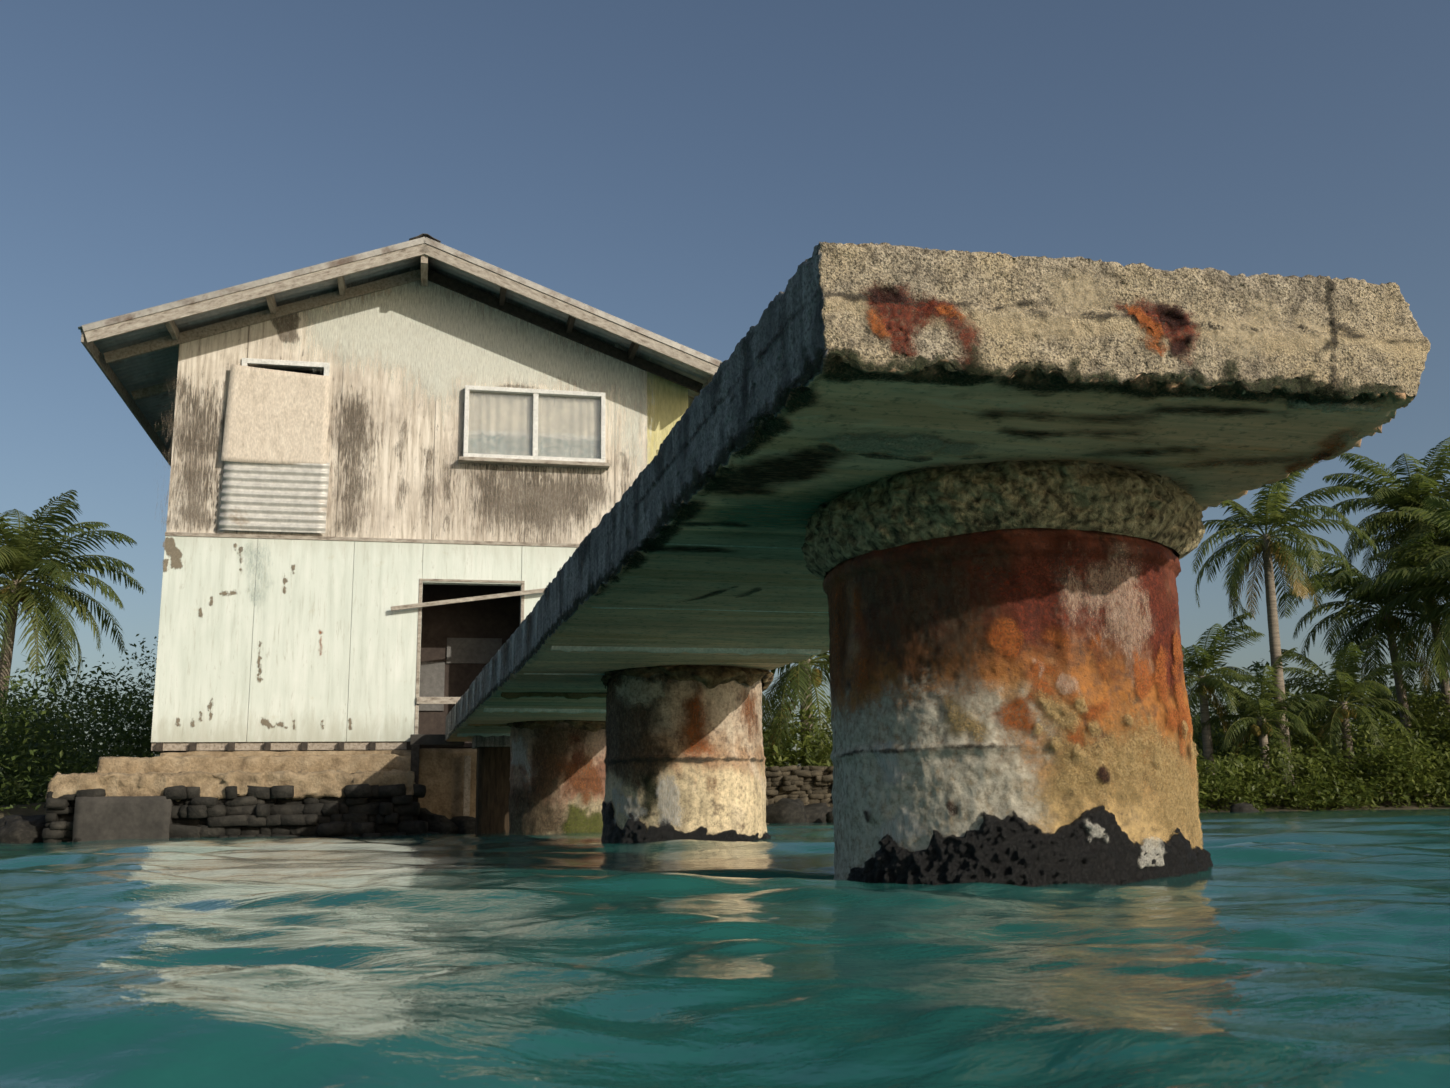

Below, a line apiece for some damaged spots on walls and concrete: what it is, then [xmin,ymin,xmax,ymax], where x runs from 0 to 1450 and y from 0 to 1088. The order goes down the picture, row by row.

rust [868,286,979,364]
rust [1118,300,1199,357]
leakage [161,377,224,533]
leakage [327,394,379,532]
leakage [395,334,848,596]
peeling [162,537,183,572]
leakage [449,567,561,727]
rust [827,569,870,698]
rust [945,536,1192,754]
peeling [176,698,213,727]
peeling [261,718,295,729]
rust [742,694,758,732]